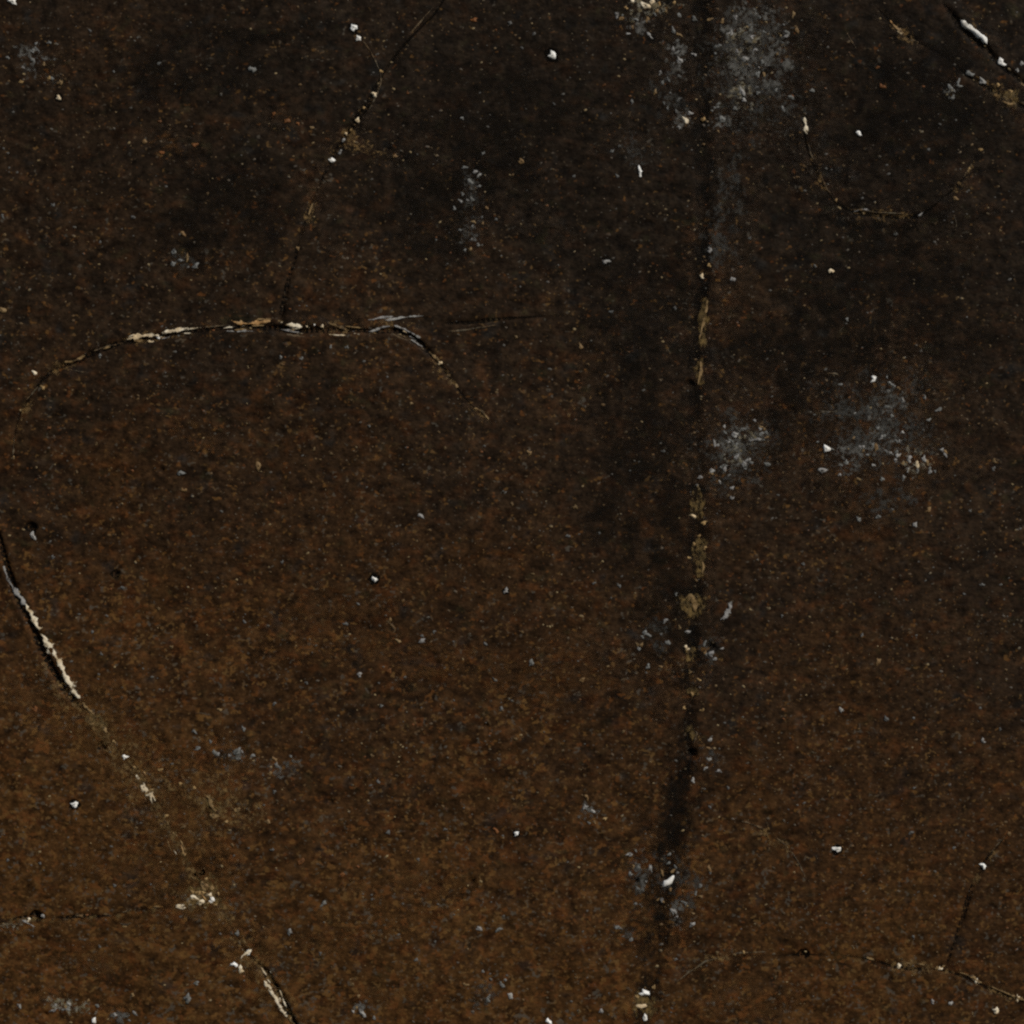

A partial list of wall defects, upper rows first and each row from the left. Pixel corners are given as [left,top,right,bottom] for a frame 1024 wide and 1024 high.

water stain [615,0,815,133]
crack [879,4,1024,108]
crack [11,0,489,460]
crack [447,316,539,332]
water stain [637,618,681,651]
crack [0,536,298,1024]
water stain [624,850,712,923]